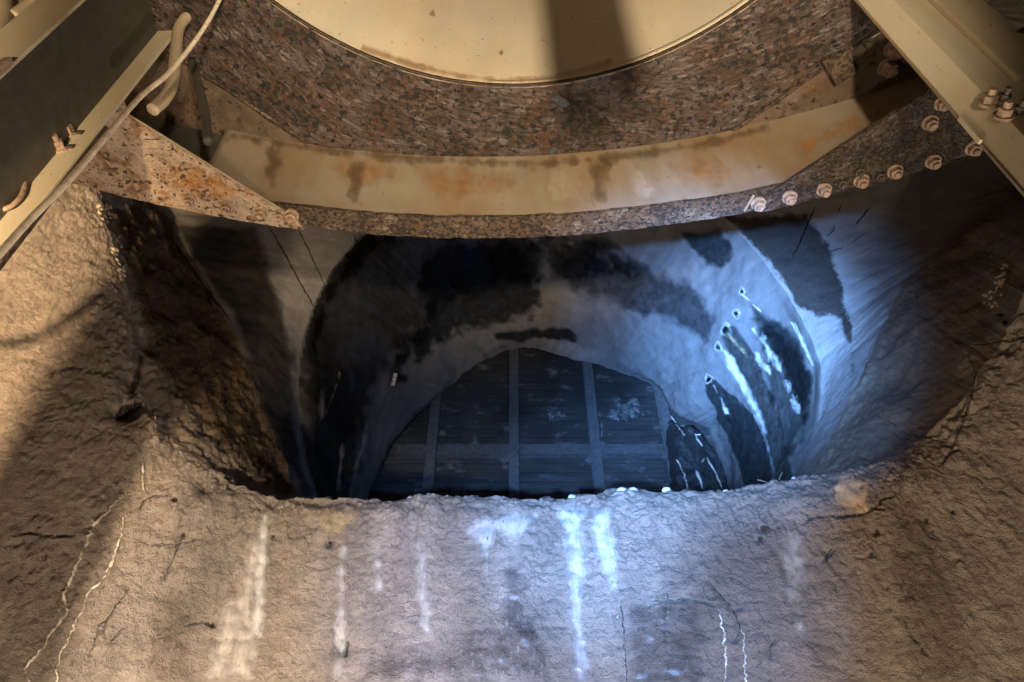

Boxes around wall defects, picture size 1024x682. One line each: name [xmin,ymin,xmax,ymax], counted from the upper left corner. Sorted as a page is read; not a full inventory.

damp [683,230,731,266]
damp [725,213,852,342]
damp [180,227,710,498]
damp [706,294,814,486]
crack [942,336,1024,464]
crack [12,530,68,538]
damp [470,514,527,549]
crack [803,497,893,524]
crack [89,591,126,655]
damp [212,517,266,676]
damp [574,600,589,678]
crack [620,580,741,682]